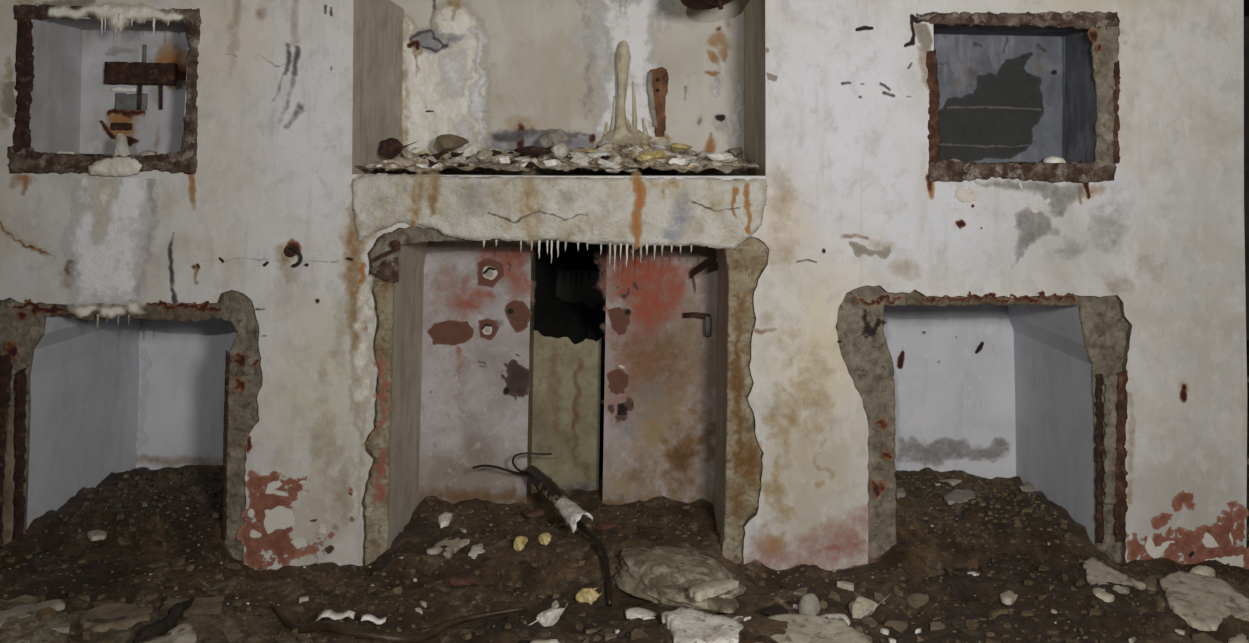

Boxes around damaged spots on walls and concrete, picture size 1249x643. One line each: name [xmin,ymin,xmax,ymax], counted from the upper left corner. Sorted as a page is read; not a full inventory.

peeling [938,35,1057,162]
water stain [64,177,156,330]
spalling [0,290,335,570]
spalling [364,226,471,566]
peeling [427,239,585,355]
peeling [501,354,532,400]
rust [631,172,646,248]
peeling [605,248,692,420]
spalling [722,237,768,564]
peeling [845,235,896,259]
spalling [758,285,1249,570]